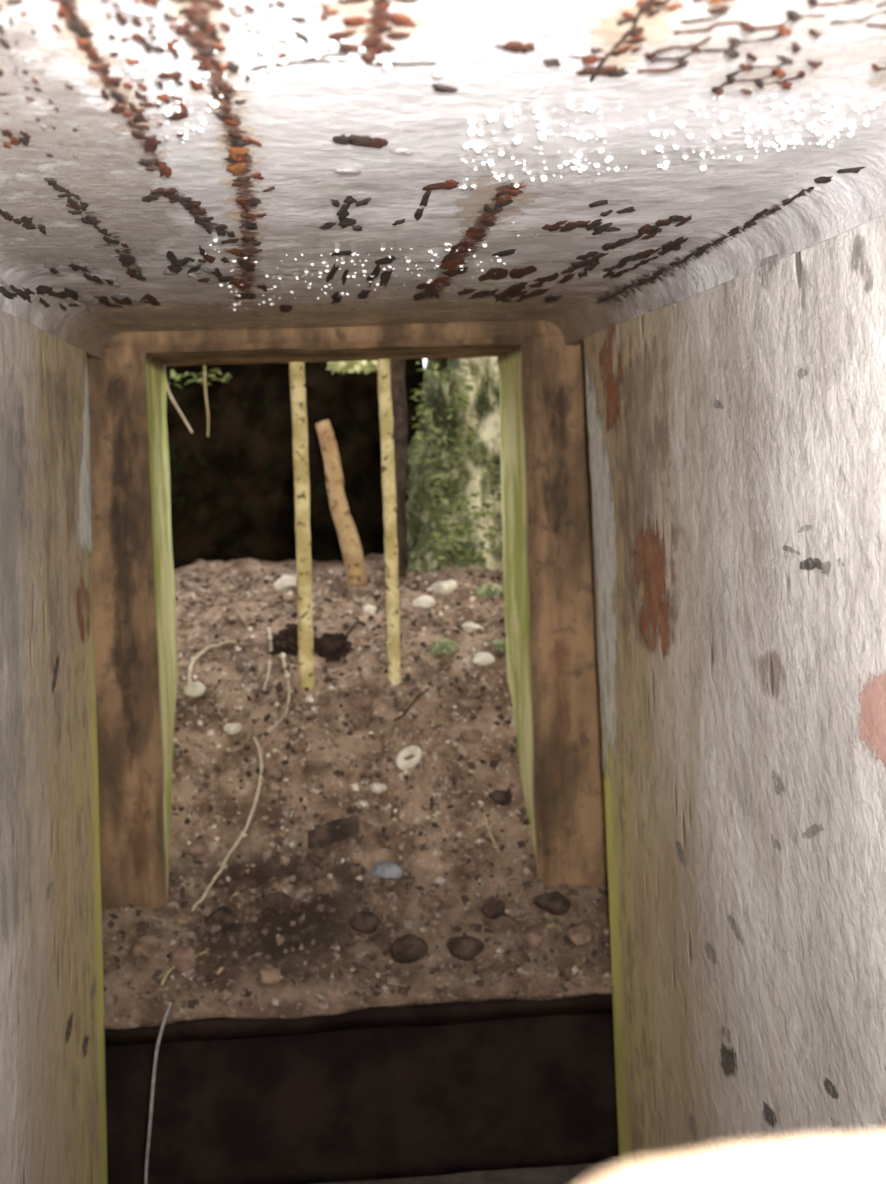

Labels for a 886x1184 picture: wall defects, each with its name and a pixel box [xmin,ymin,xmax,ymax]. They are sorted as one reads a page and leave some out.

corrosion [328,0,422,62]
spalling [663,0,734,19]
corrosion [43,0,275,300]
corrosion [0,209,46,235]
corrosion [392,167,865,307]
corrosion [594,322,622,428]
corrosion [633,520,673,658]
spalling [858,674,886,765]